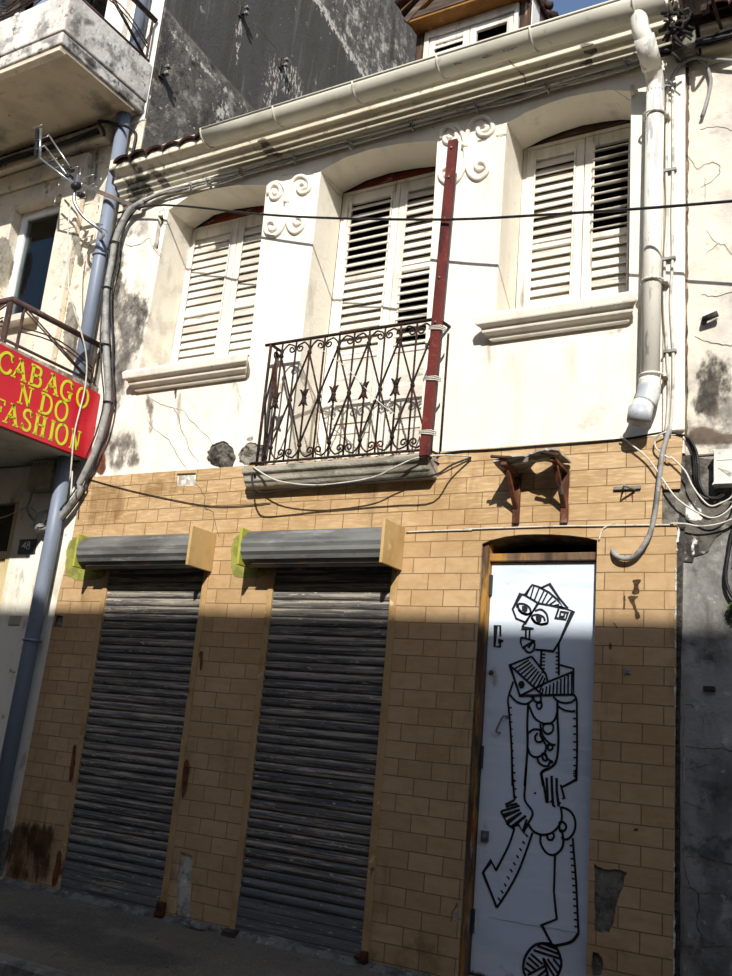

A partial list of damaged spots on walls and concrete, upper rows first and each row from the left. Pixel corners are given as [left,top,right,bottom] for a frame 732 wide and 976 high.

damp [263,59,304,105]
damp [125,176,154,198]
crack [688,156,721,189]
damp [110,252,148,407]
damp [688,357,732,444]
damp [107,431,139,469]
crack [145,394,219,536]
damp [675,456,732,562]
spalling [594,865,627,933]
spalling [592,952,603,976]